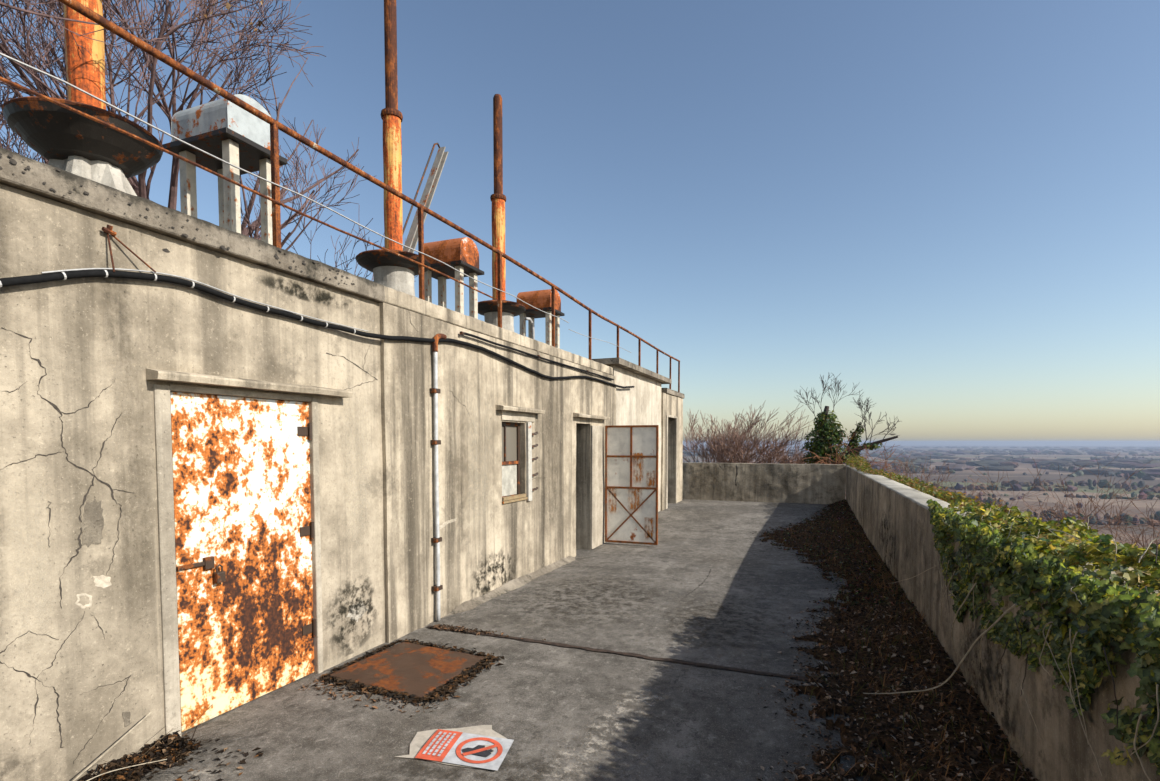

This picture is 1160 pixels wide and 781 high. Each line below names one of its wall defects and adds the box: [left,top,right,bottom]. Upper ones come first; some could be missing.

corrosion [630,453,655,510]
crack [0,327,131,764]
damp [472,555,513,595]
damp [331,580,373,650]